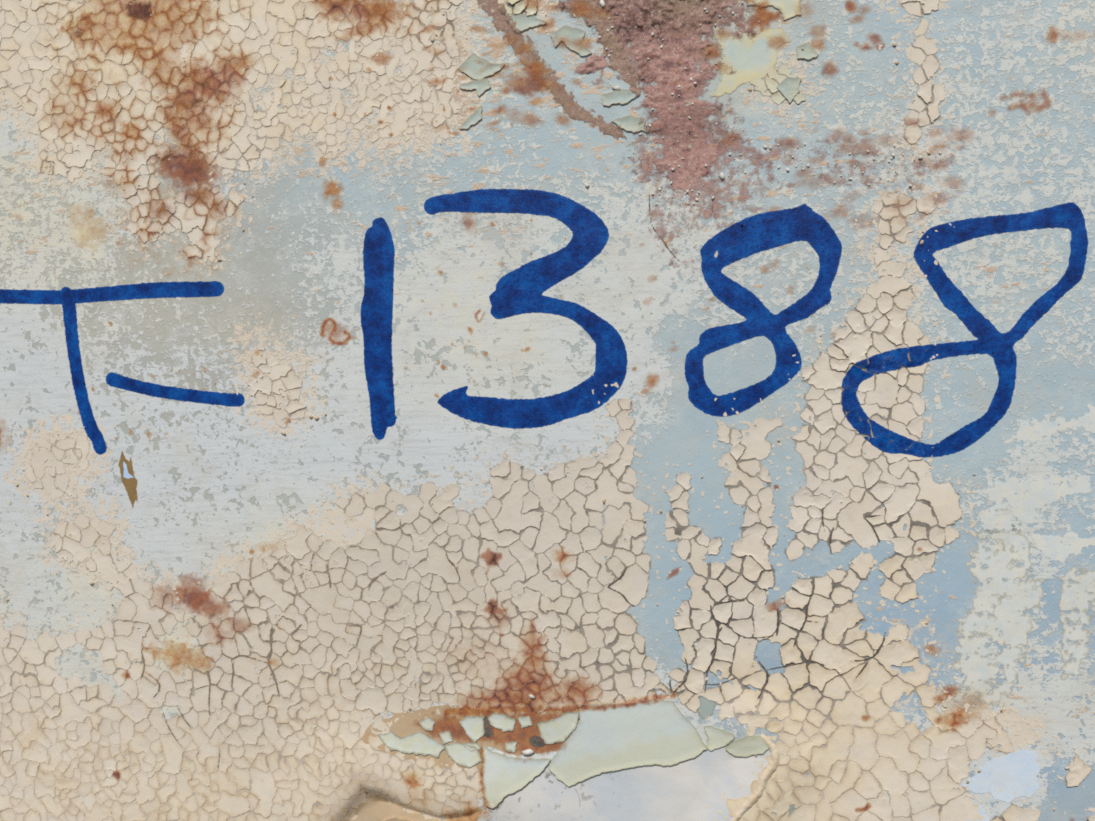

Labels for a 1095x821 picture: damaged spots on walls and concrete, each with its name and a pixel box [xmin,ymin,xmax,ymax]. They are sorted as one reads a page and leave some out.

rust [73,0,210,61]
rust [316,0,395,35]
rust [156,53,245,213]
peeling [0,0,505,263]
peeling [612,115,647,133]
rust [478,0,792,267]
peeling [0,190,1095,821]
crack [141,624,302,748]
rust [418,624,676,821]
crack [669,600,742,693]
crack [750,583,824,699]
crack [854,632,886,678]